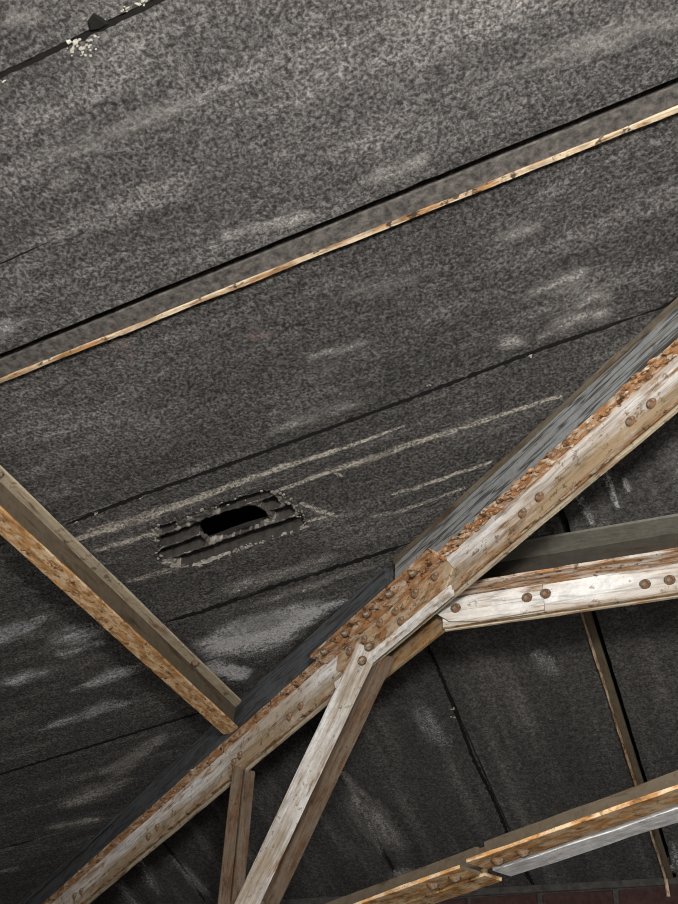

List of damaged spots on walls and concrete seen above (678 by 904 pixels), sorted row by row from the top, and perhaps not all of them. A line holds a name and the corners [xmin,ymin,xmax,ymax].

hole [151,489,309,568]
leakage [76,425,406,552]
leakage [273,395,563,495]
leakage [373,487,466,518]